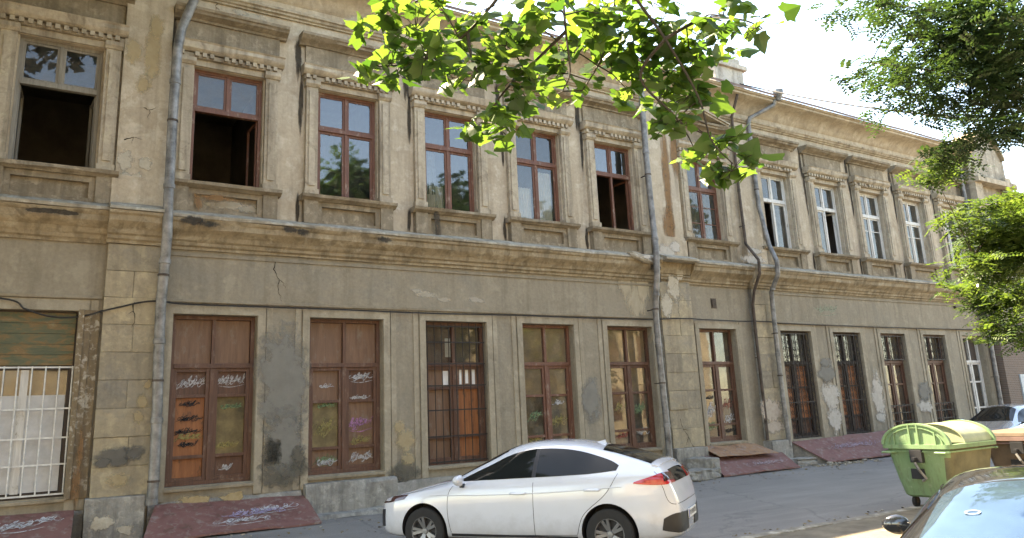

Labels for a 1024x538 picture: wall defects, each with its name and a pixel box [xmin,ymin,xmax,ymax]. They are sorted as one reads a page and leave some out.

spalling [651,241,683,318]
peeling [822,380,842,435]
peeling [872,373,886,422]
damp [262,440,309,487]